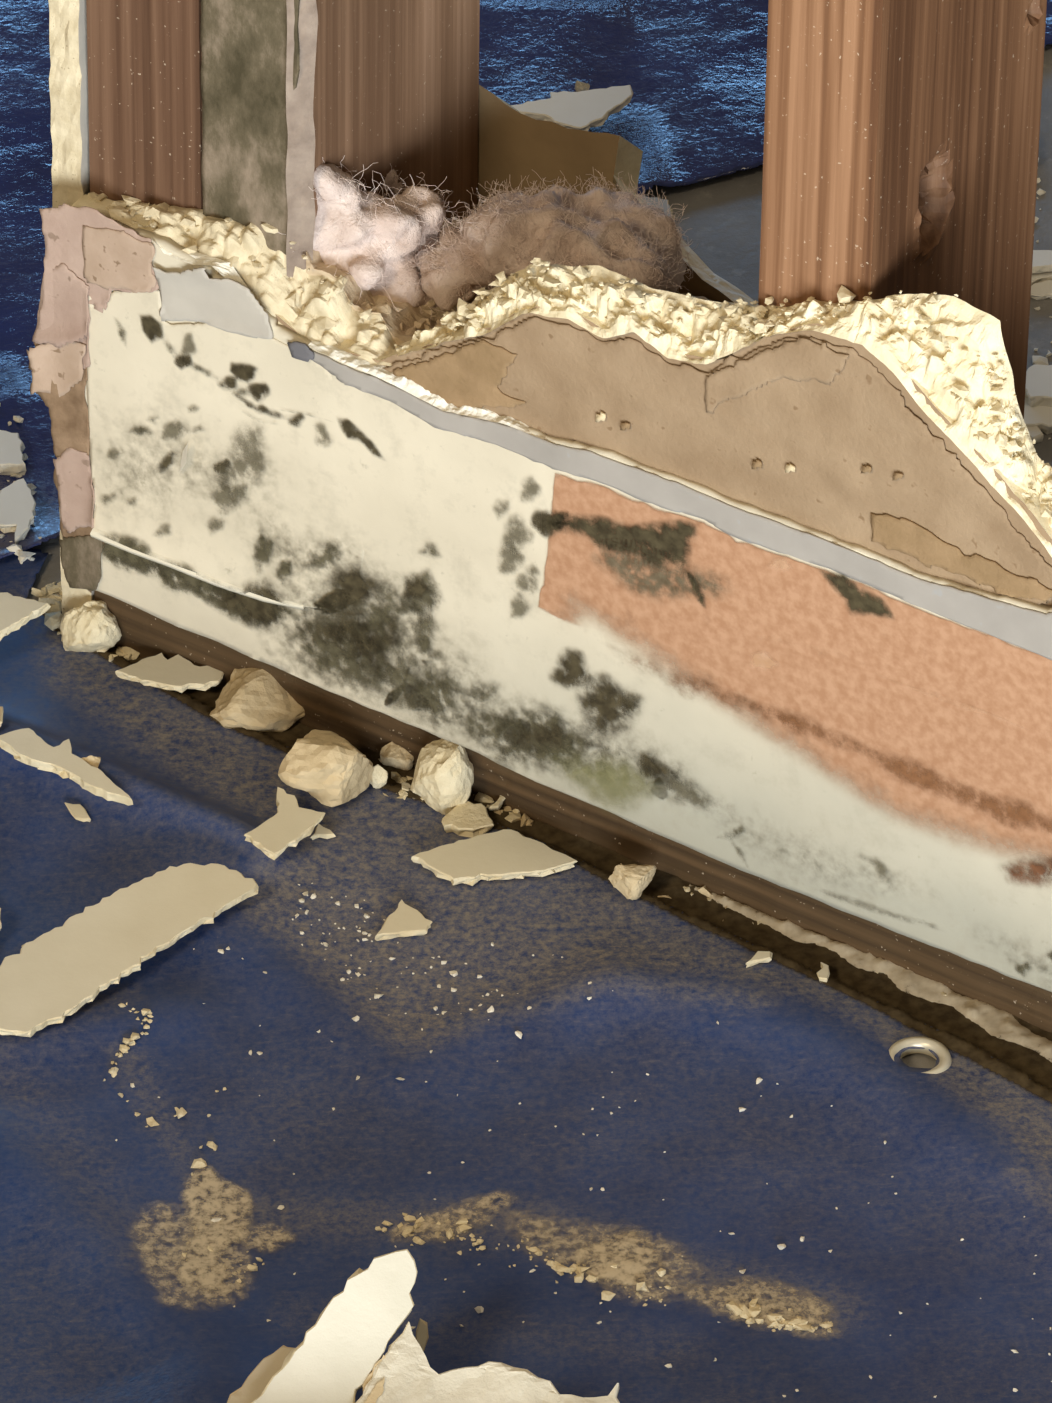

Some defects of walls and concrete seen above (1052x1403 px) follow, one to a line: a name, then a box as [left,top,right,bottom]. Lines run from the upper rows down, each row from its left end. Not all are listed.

damp [132,419,201,473]
damp [209,432,264,531]
damp [141,317,381,457]
peeling [87,192,1052,660]
damp [101,537,708,805]
damp [496,474,1052,858]